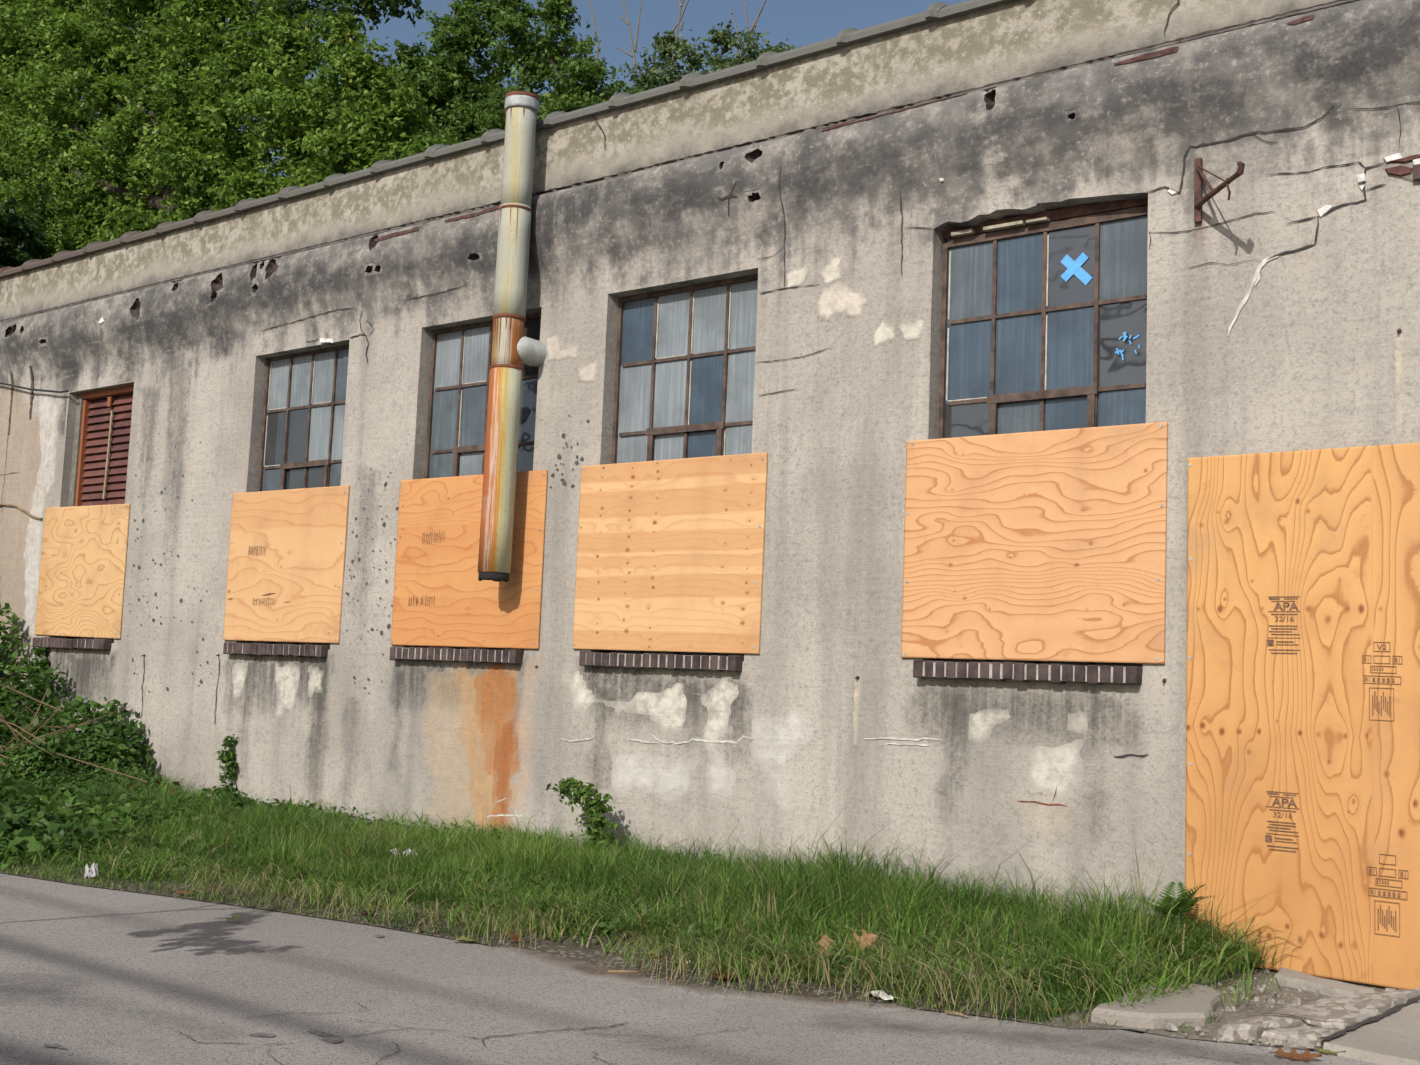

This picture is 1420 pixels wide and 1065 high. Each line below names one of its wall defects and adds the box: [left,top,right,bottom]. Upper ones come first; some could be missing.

spalling [210,273,224,302]
spalling [250,259,279,293]
crack [260,308,374,364]
flaking render [364,227,419,273]
crack [0,0,1347,321]
peeling [784,255,925,348]
water stain [610,0,1420,259]
crack [1147,101,1420,336]
corrosion [417,649,548,834]
water stain [556,651,818,825]
water stain [895,664,1158,867]
crack [234,1002,746,1065]